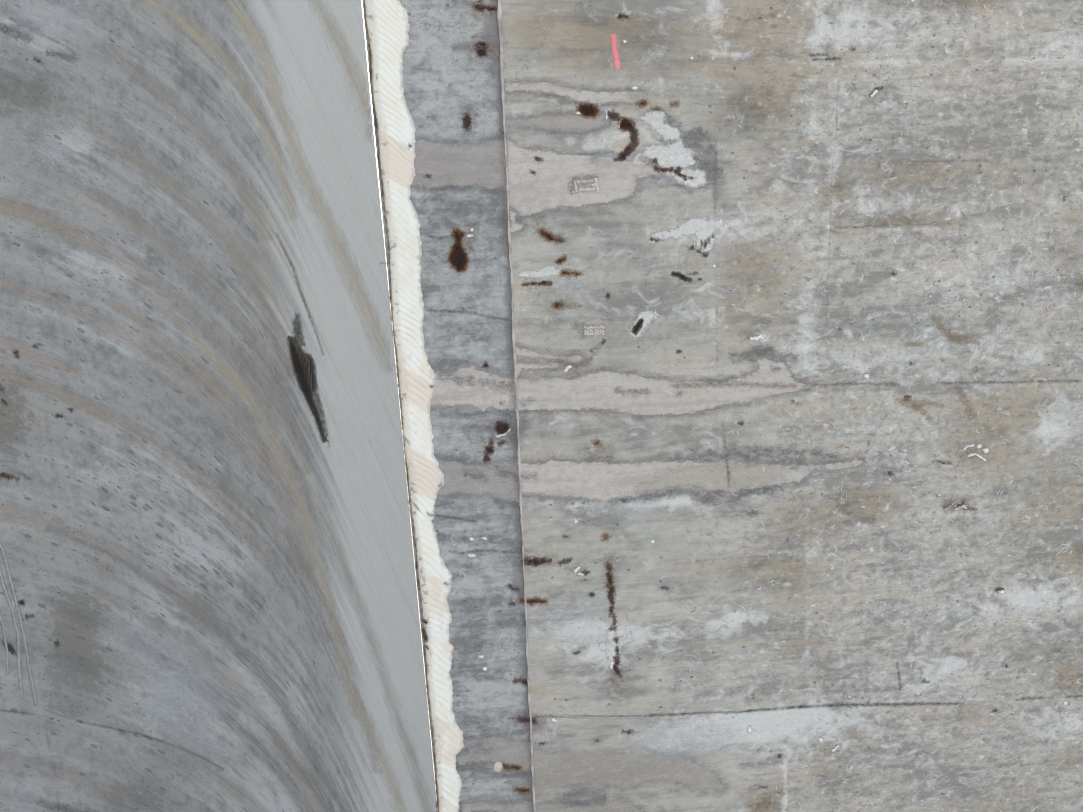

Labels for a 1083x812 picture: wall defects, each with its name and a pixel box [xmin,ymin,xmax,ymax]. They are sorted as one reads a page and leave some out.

rust [475,42,490,58]
rust [576,103,693,181]
rust [447,228,473,273]
rust [539,229,564,243]
rust [522,256,582,286]
spalling [287,314,327,443]
rust [483,420,511,463]
rust [521,557,571,566]
rust [508,584,548,606]
rust [605,562,622,684]